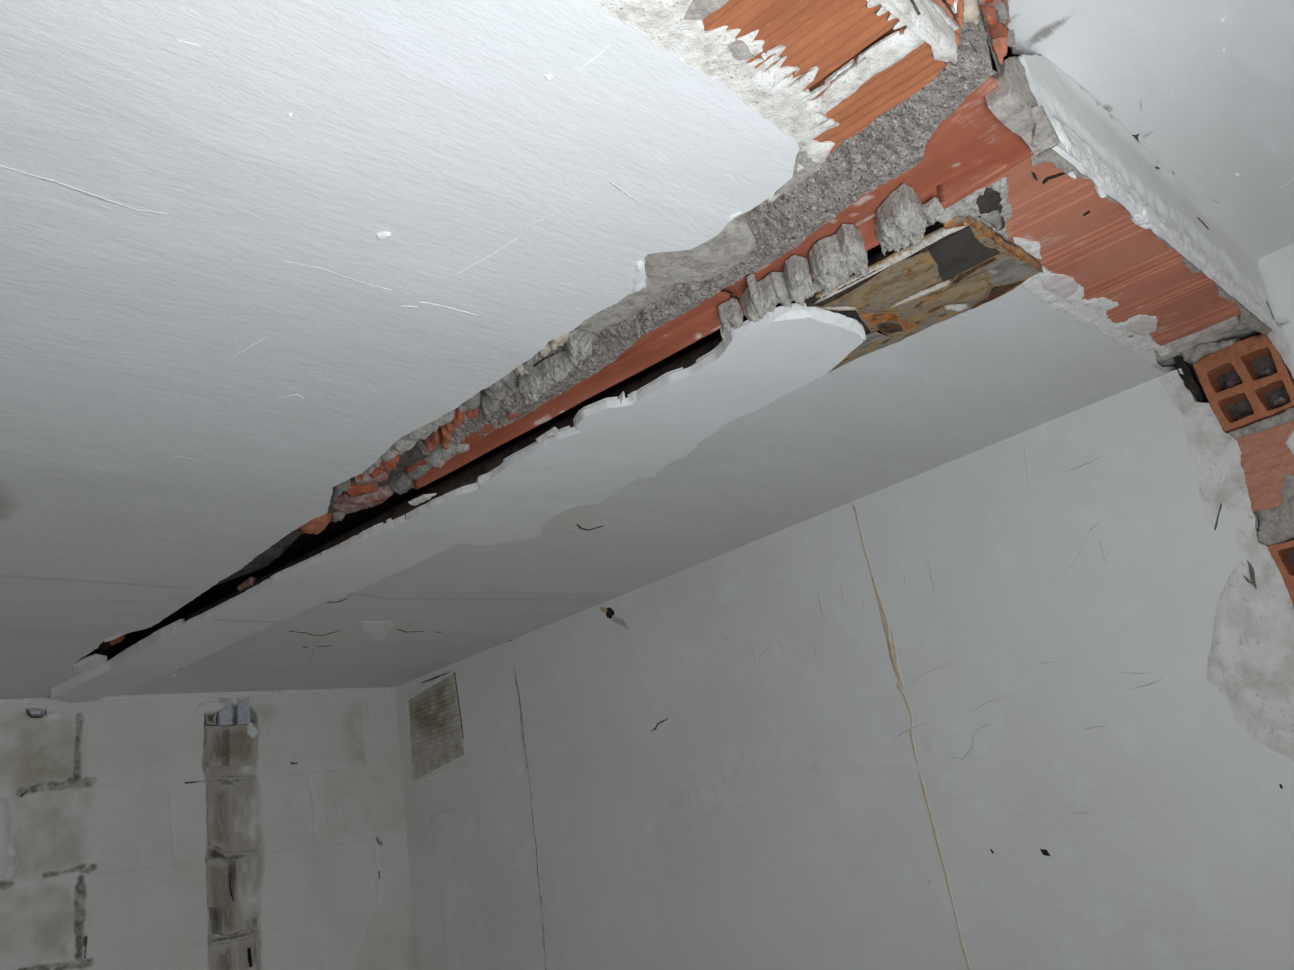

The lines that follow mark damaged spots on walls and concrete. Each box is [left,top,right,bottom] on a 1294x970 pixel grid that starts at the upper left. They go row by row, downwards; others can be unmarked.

spalling [72,633,129,674]
spalling [182,0,1294,762]